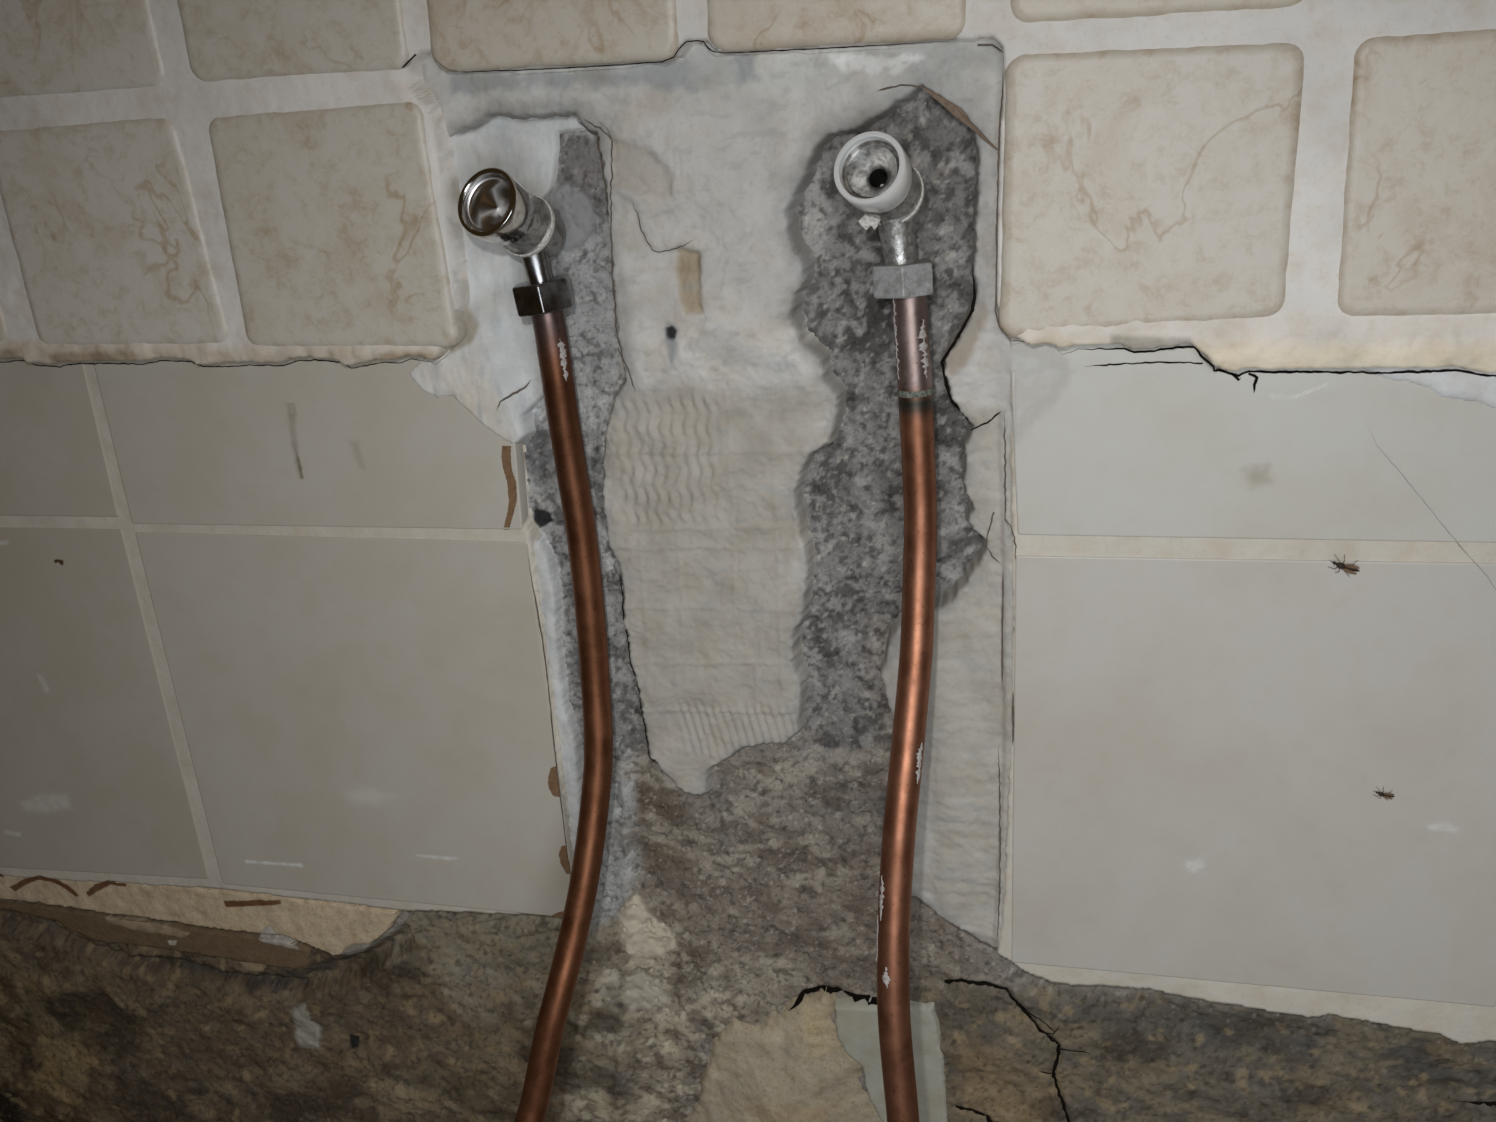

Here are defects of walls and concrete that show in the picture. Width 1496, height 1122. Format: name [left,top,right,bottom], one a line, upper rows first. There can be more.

spalling [485,86,998,1122]
spalling [0,874,564,1122]
spalling [910,896,1496,1122]